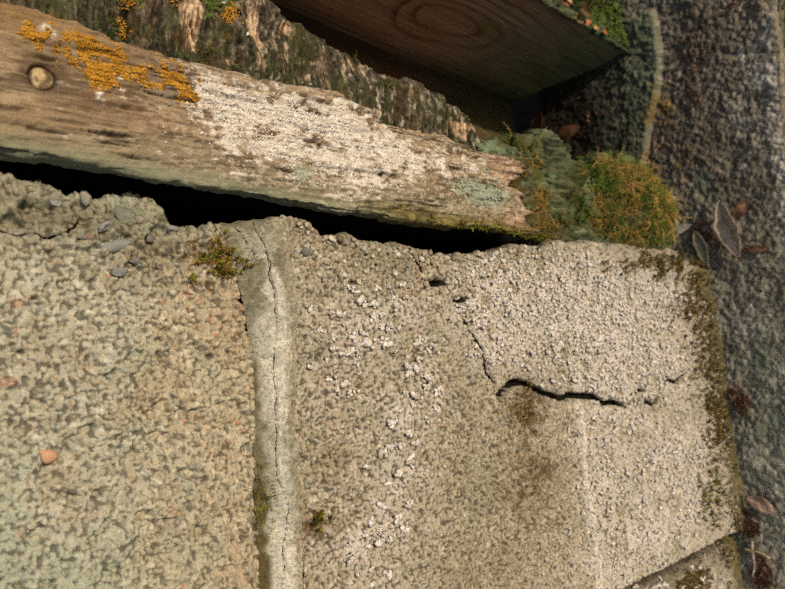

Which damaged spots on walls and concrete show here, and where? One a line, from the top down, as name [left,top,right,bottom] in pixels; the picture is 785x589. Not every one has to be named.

crack [0,218,79,239]
crack [236,222,290,585]
crack [463,319,655,409]
crack [664,360,697,384]